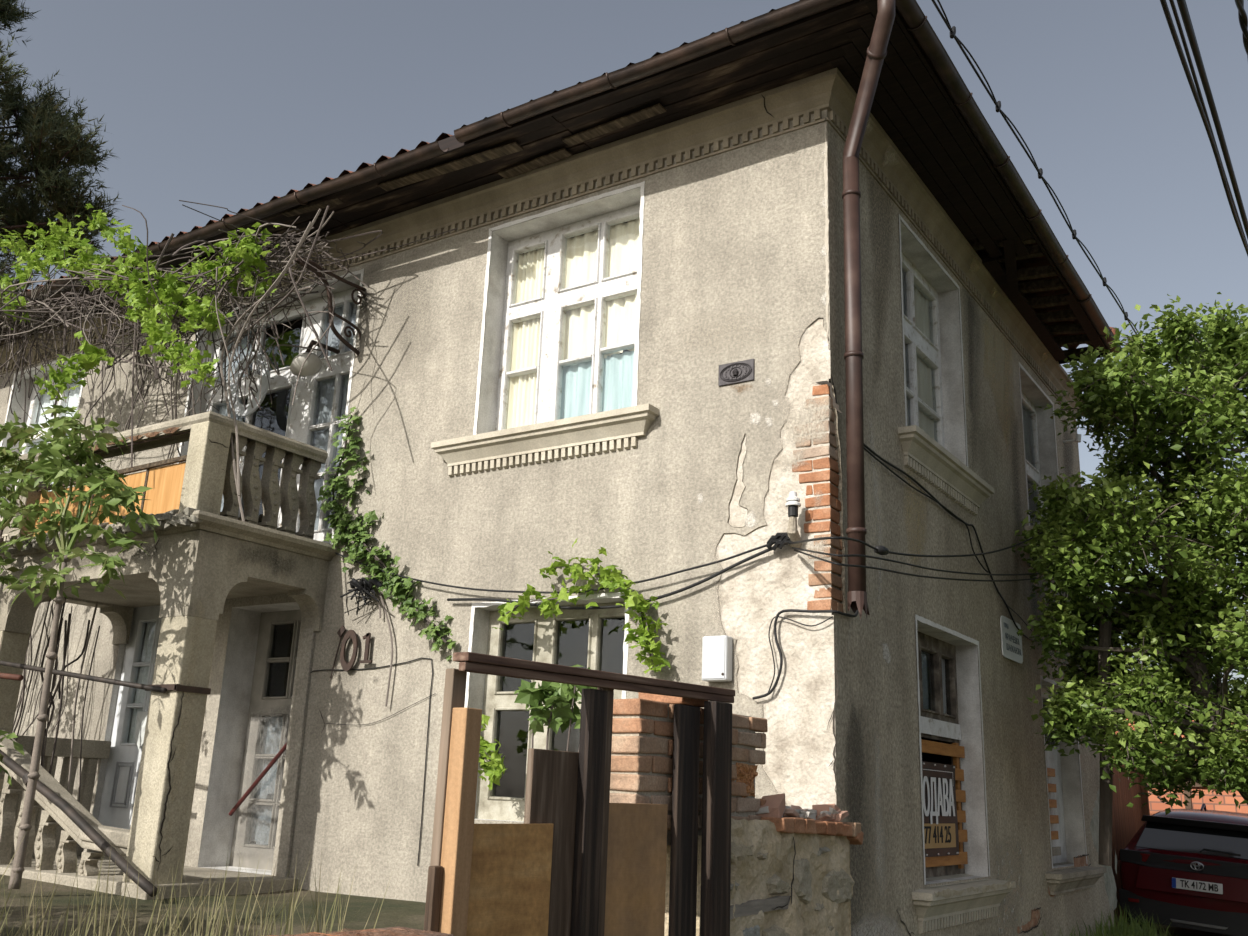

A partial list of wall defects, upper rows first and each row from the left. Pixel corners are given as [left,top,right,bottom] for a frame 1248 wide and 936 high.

crack [153,692,184,868]
flaking render [715,124,844,809]